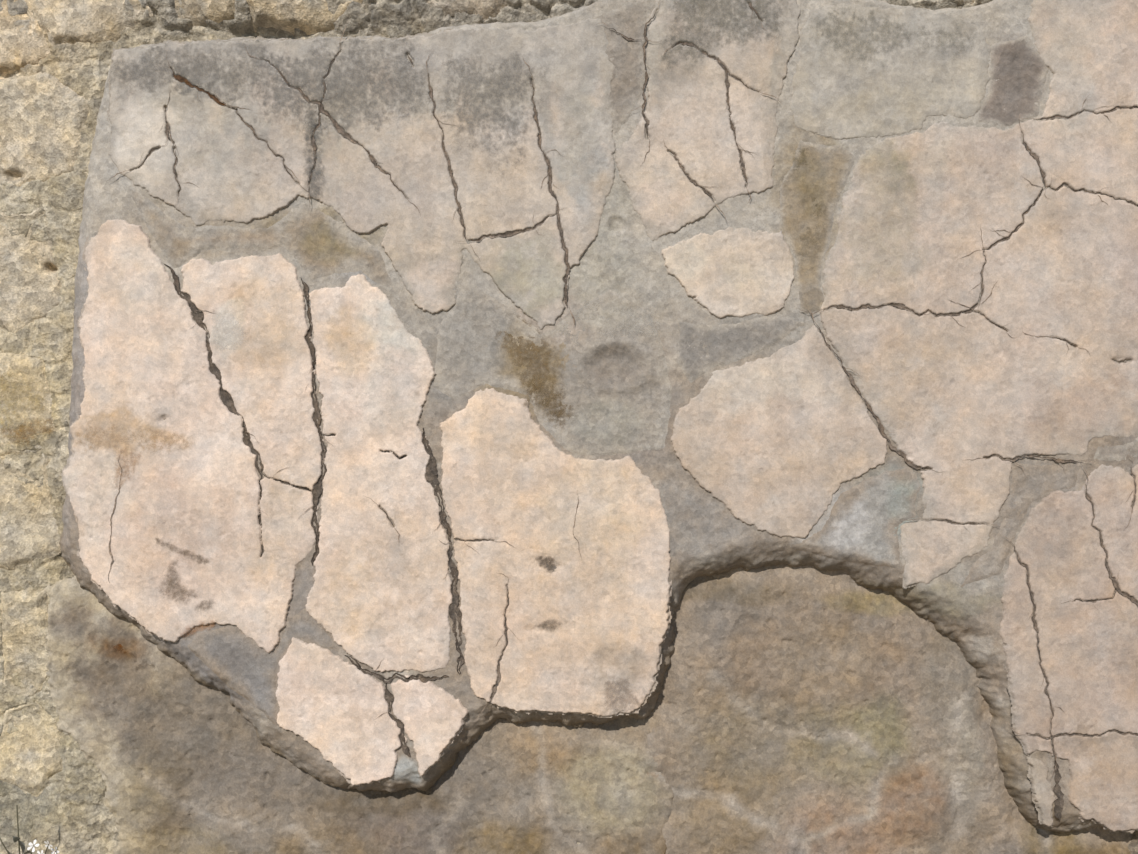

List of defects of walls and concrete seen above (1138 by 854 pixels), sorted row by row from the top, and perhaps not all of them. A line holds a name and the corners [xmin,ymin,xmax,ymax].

crack [164,264,333,566]
crack [111,24,420,213]
flaking render [61,0,673,786]
crack [345,428,519,757]
crack [407,54,575,328]
spalling [44,388,1138,854]
crack [593,1,781,221]
flaking render [614,0,1138,589]
crack [798,94,1138,820]